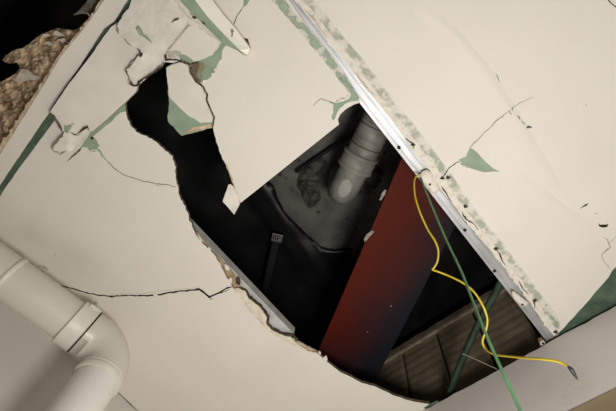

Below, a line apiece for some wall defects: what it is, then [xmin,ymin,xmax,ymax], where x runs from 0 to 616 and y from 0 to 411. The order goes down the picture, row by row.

peeling [179,43,226,83]
peeling [276,0,361,120]
peeling [81,104,126,160]
crack [471,98,532,147]
crack [107,161,174,187]
spalling [296,157,327,209]
spalling [358,165,386,201]
peeling [411,132,457,187]
peeling [459,148,500,172]
crack [61,285,233,300]
flaking render [196,231,327,362]